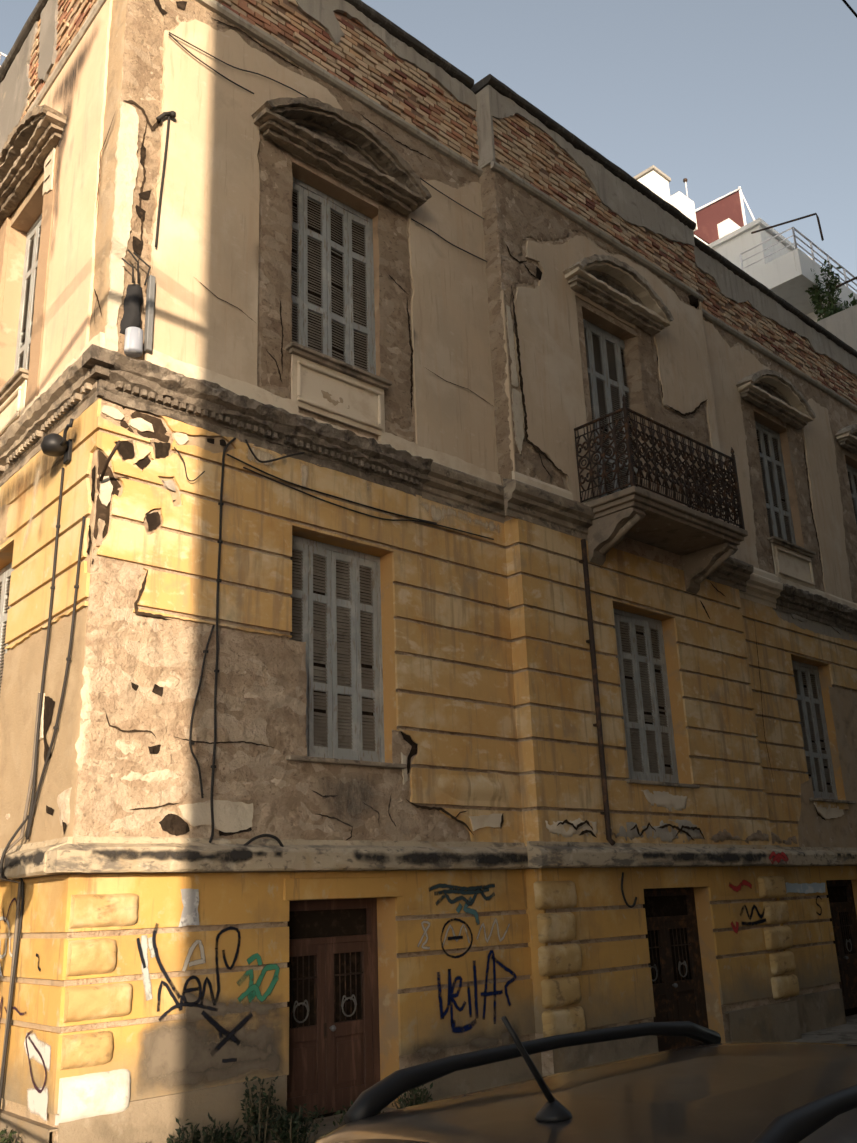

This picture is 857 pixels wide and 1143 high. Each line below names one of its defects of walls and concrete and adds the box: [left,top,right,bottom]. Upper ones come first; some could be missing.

flaking render [90,0,636,490]
flaking render [657,275,699,309]
flaking render [623,328,712,515]
flaking render [741,397,775,574]
flaking render [786,423,824,592]
flaking render [829,420,857,603]
flaking render [0,405,504,849]
peeling [545,818,598,838]
peeling [616,790,798,845]